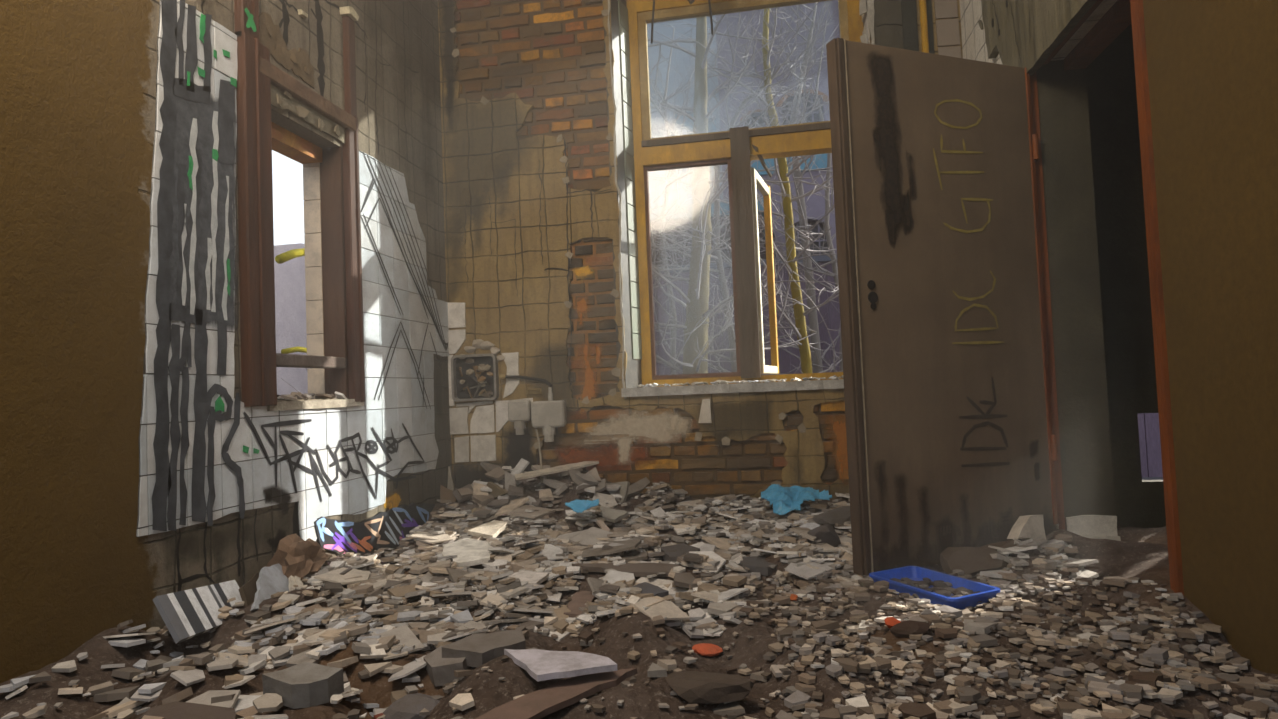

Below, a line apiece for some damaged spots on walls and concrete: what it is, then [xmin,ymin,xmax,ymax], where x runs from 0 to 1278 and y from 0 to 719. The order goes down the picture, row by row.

flaking render [450,0,613,191]
flaking render [533,238,849,499]